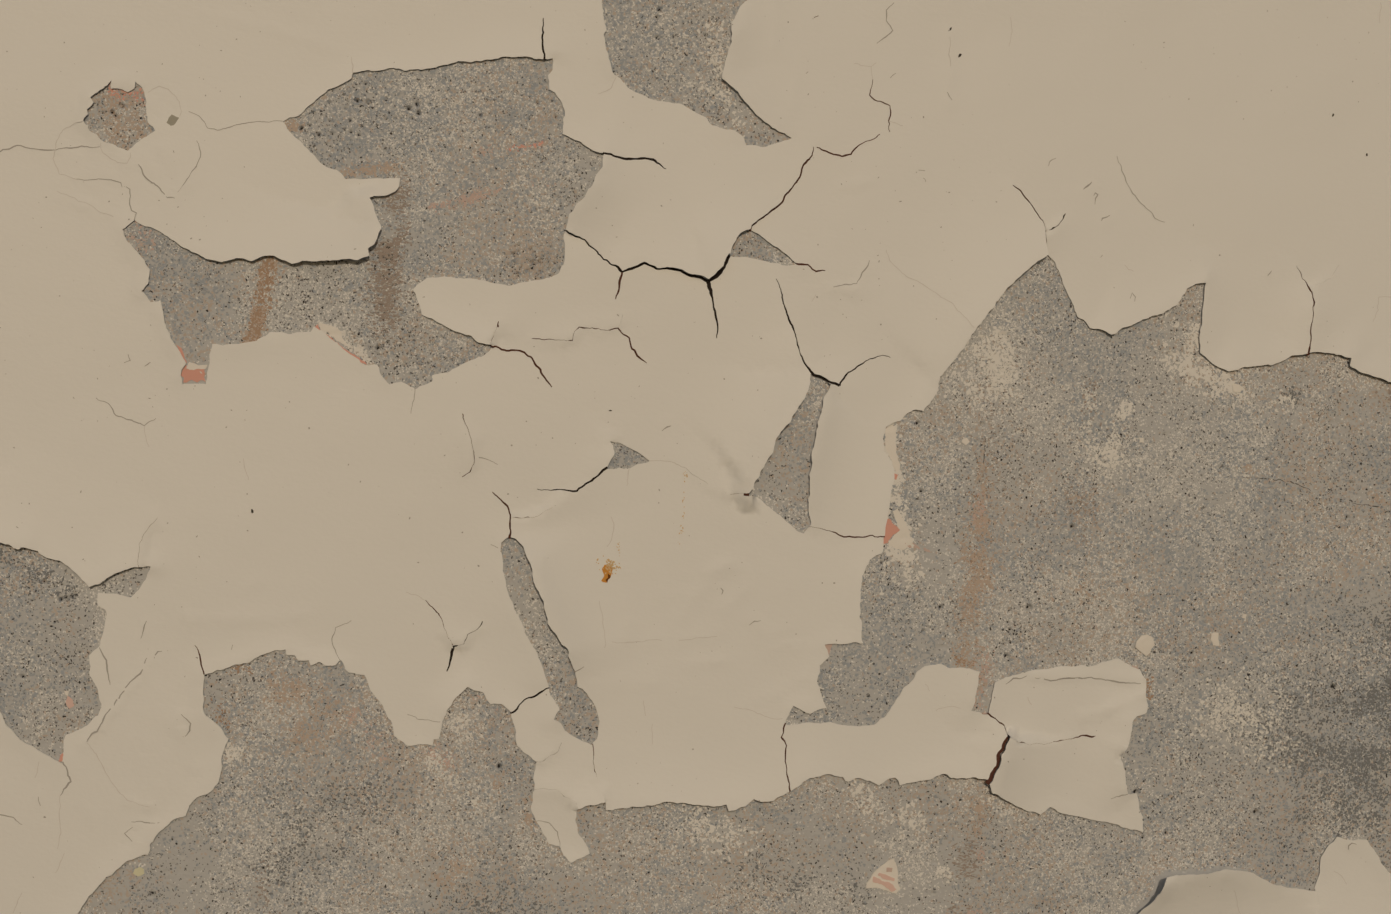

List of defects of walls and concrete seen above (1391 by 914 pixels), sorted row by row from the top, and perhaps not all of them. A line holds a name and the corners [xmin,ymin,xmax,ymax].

spalling [83,83,179,149]
crack [0,86,278,220]
crack [490,3,903,387]
crack [776,250,971,387]
peeling [0,461,157,763]
rust [596,542,621,583]
spalling [79,141,1391,914]